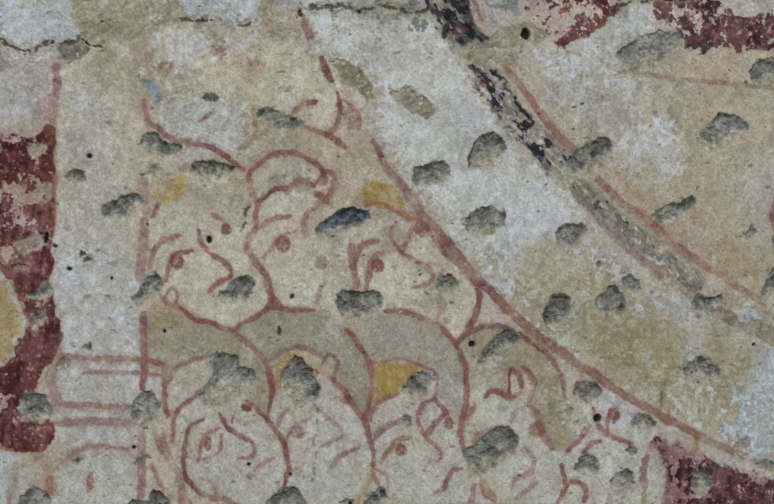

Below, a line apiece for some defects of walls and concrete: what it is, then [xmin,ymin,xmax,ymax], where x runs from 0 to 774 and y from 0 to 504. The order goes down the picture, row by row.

crack [0,36,106,57]
peeling [425,0,707,297]
spalling [698,129,748,158]
spalling [200,380,257,410]
spalling [280,379,317,409]
spalling [463,446,518,480]